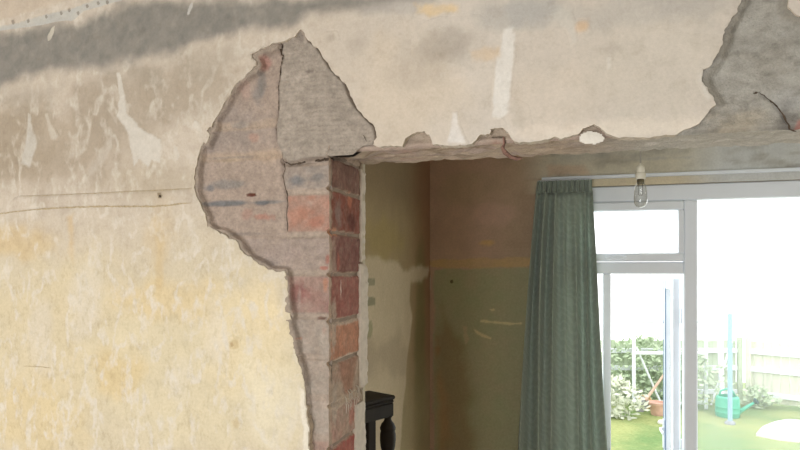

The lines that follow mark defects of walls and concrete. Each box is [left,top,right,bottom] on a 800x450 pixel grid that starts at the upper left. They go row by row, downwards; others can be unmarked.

damp [0,0,442,131]
crack [276,43,347,232]
spalling [192,0,800,450]
crack [753,92,796,132]